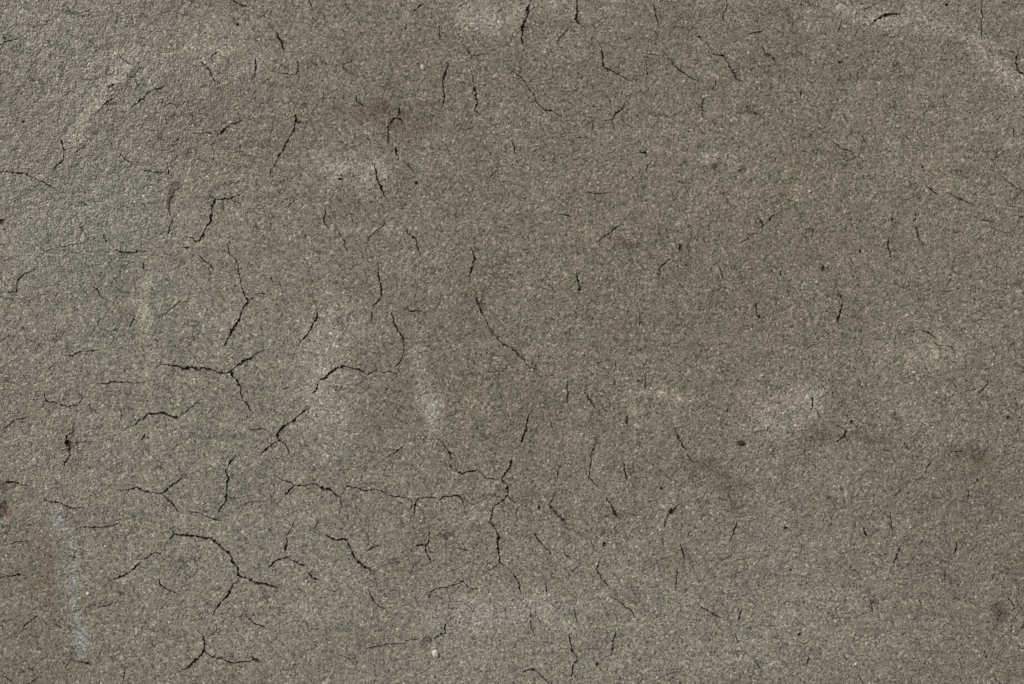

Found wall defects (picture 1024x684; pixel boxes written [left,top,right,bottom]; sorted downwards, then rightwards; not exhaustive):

crack [93,54,168,114]
crack [201,41,228,82]
crack [233,0,299,82]
crack [438,1,485,115]
crack [507,69,562,117]
crack [0,107,636,684]
crack [675,430,699,463]
crack [661,505,691,589]